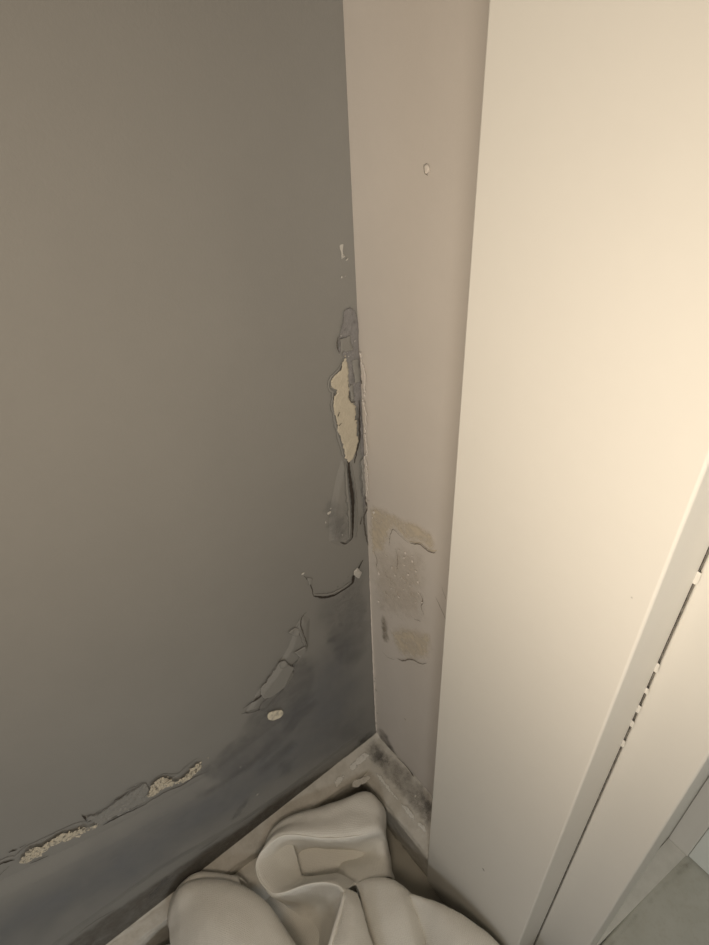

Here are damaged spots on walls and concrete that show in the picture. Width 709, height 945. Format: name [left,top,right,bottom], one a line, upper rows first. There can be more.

flaking render [327,308,375,519]
peeling [369,549,423,733]
peeling [260,661,294,699]
peeling [267,708,283,721]
flaking render [147,757,209,803]
flaking render [14,821,98,864]